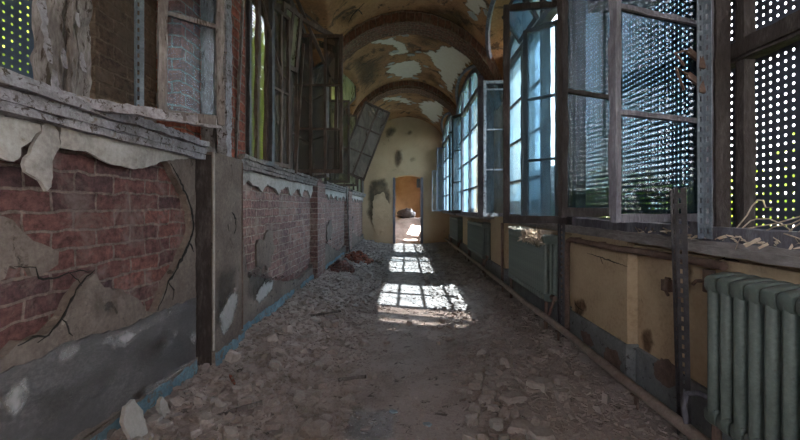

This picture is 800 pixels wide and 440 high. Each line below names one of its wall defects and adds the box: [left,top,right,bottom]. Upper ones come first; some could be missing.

peeling [371,34,471,93]
peeling [383,96,444,124]
crack [14,266,95,346]
flaking render [0,114,190,350]
crack [157,163,195,311]
flaking render [215,170,314,366]
leakage [368,180,390,221]